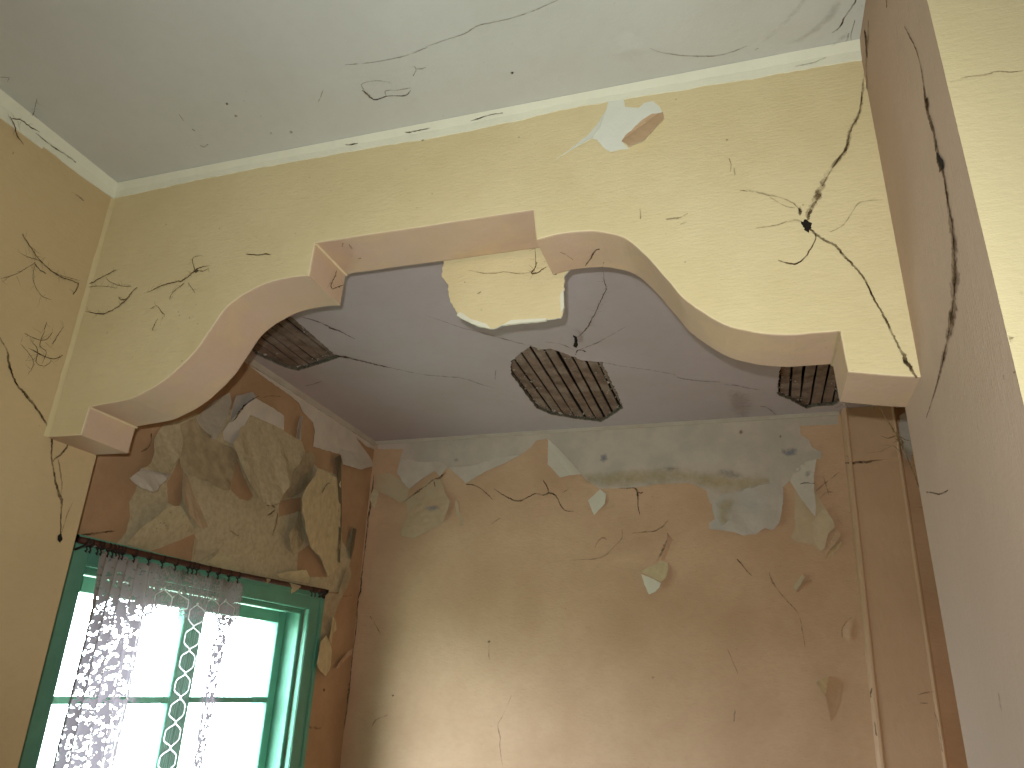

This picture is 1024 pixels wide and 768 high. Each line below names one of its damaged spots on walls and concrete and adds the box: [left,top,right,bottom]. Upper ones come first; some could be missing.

crack [840,0,887,55]
crack [349,57,414,100]
peeling [557,99,664,159]
crack [781,28,957,417]
crack [85,255,209,326]
peeling [441,248,570,330]
flaking render [252,317,339,370]
crack [303,317,390,368]
crack [1,340,113,542]
peeling [118,346,839,676]
crack [409,473,571,512]